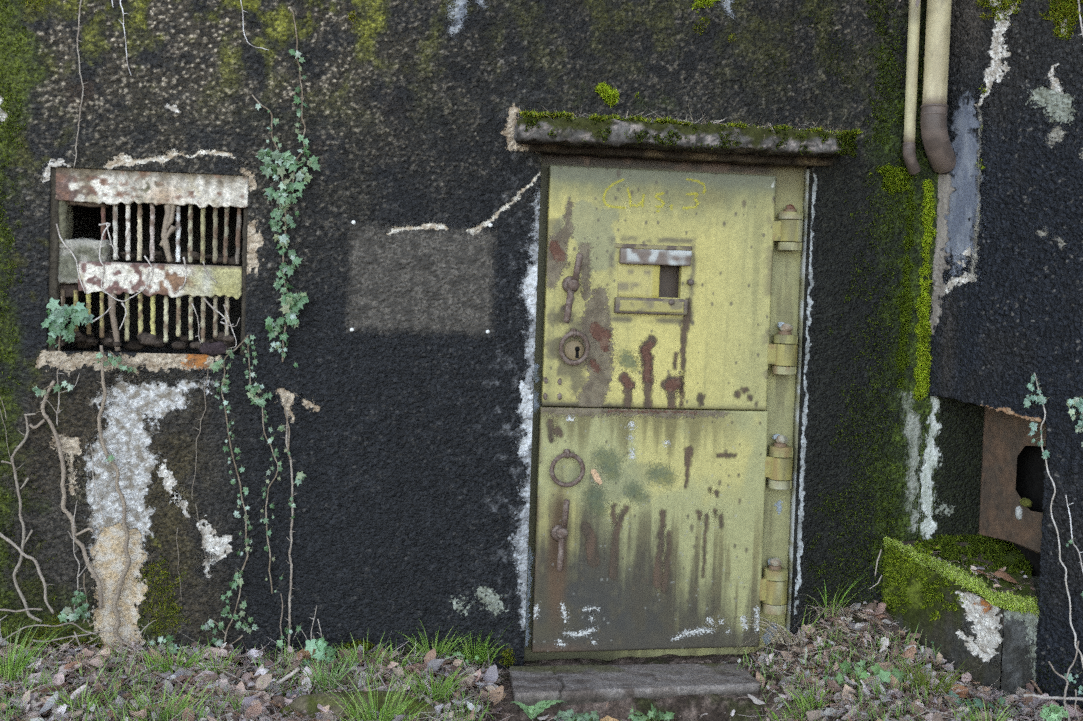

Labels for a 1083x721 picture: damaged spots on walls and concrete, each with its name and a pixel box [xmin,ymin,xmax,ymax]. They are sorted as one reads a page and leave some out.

spalling [72,202,264,274]
crack [386,172,541,236]
peeling [929,91,983,335]
rust [540,200,731,443]
peeling [508,188,540,646]
flaking render [35,291,242,650]
rust [684,446,693,488]
rust [581,503,629,579]
rust [653,510,671,593]
rust [696,488,723,578]
peeling [554,601,600,651]
flaking render [954,591,1038,681]